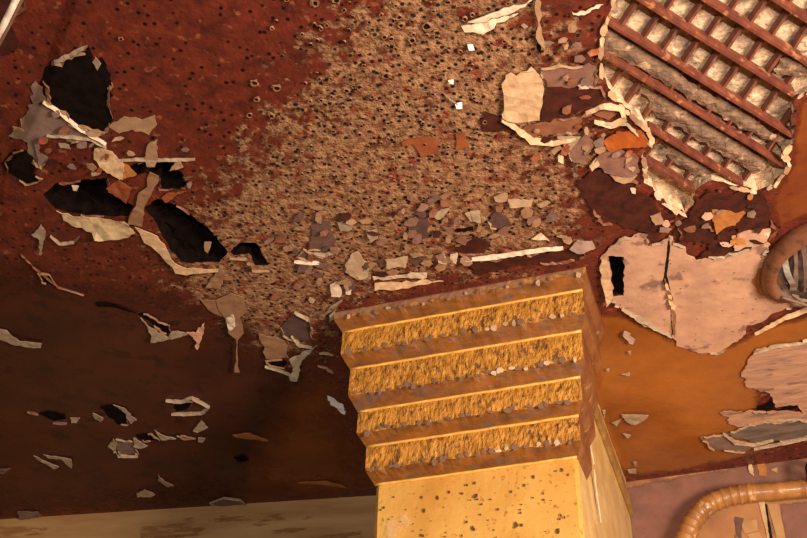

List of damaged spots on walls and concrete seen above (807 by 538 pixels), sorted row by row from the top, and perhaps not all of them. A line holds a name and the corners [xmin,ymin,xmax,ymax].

flaking render [0,0,807,356]
crack [663,240,676,337]
peeling [93,404,137,426]
peeling [108,396,210,458]
peeling [259,311,333,382]
peeling [327,396,346,415]
peeling [353,356,577,396]
peeling [602,410,649,438]
flaking render [700,339,807,454]
peeling [33,454,72,469]
peeling [627,458,807,538]
crack [758,501,785,538]